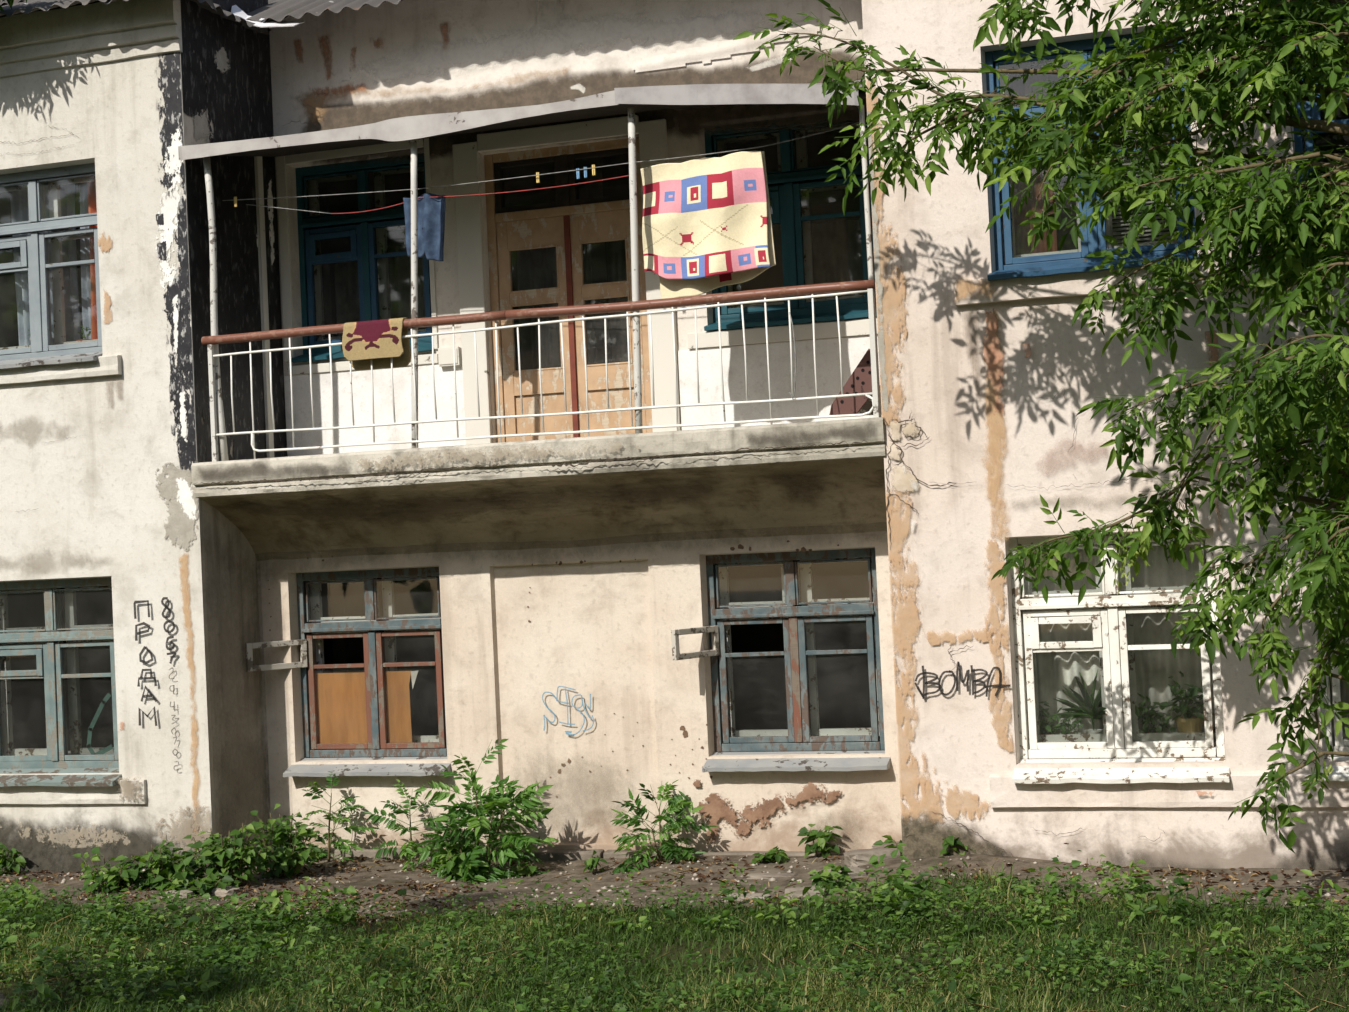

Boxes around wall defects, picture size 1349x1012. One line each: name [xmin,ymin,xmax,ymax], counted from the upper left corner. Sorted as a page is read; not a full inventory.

water stain [302,49,867,165]
peeling [155,0,287,551]
crack [195,408,972,550]
crack [1006,386,1171,489]
rust [179,555,194,696]
peeling [885,488,1014,858]
water stain [0,820,165,872]
rust [191,714,200,851]
peeling [670,724,842,843]